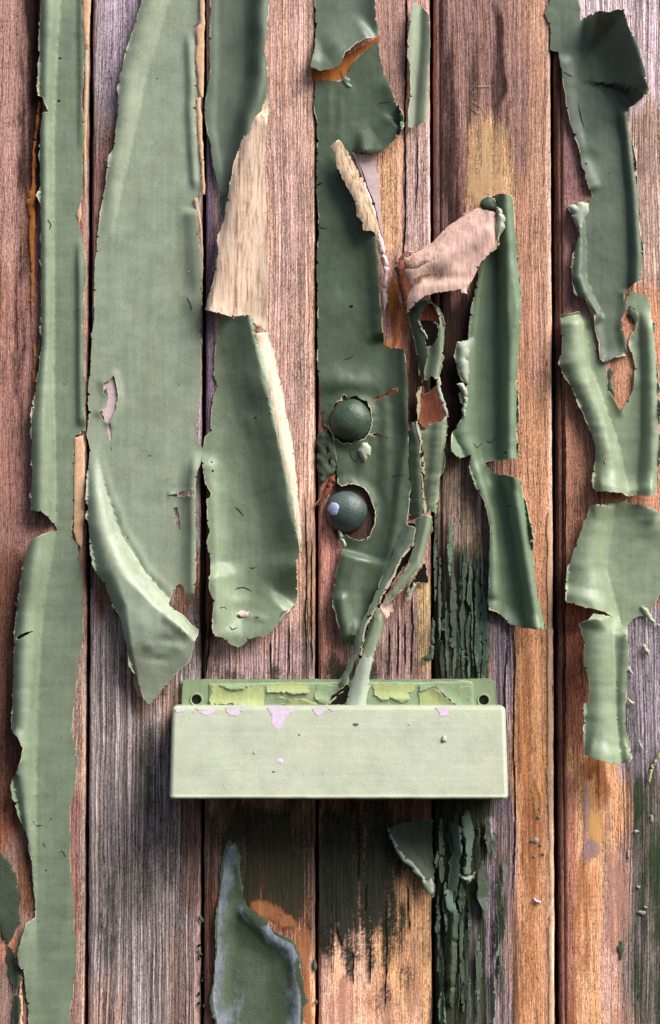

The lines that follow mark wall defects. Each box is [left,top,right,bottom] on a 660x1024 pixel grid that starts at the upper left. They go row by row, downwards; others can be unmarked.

peeling [0,0,314,1024]
peeling [175,0,546,729]
peeling [545,0,660,765]
leakage [212,800,419,990]
peeling [330,975,354,1024]
peeling [388,809,506,1024]